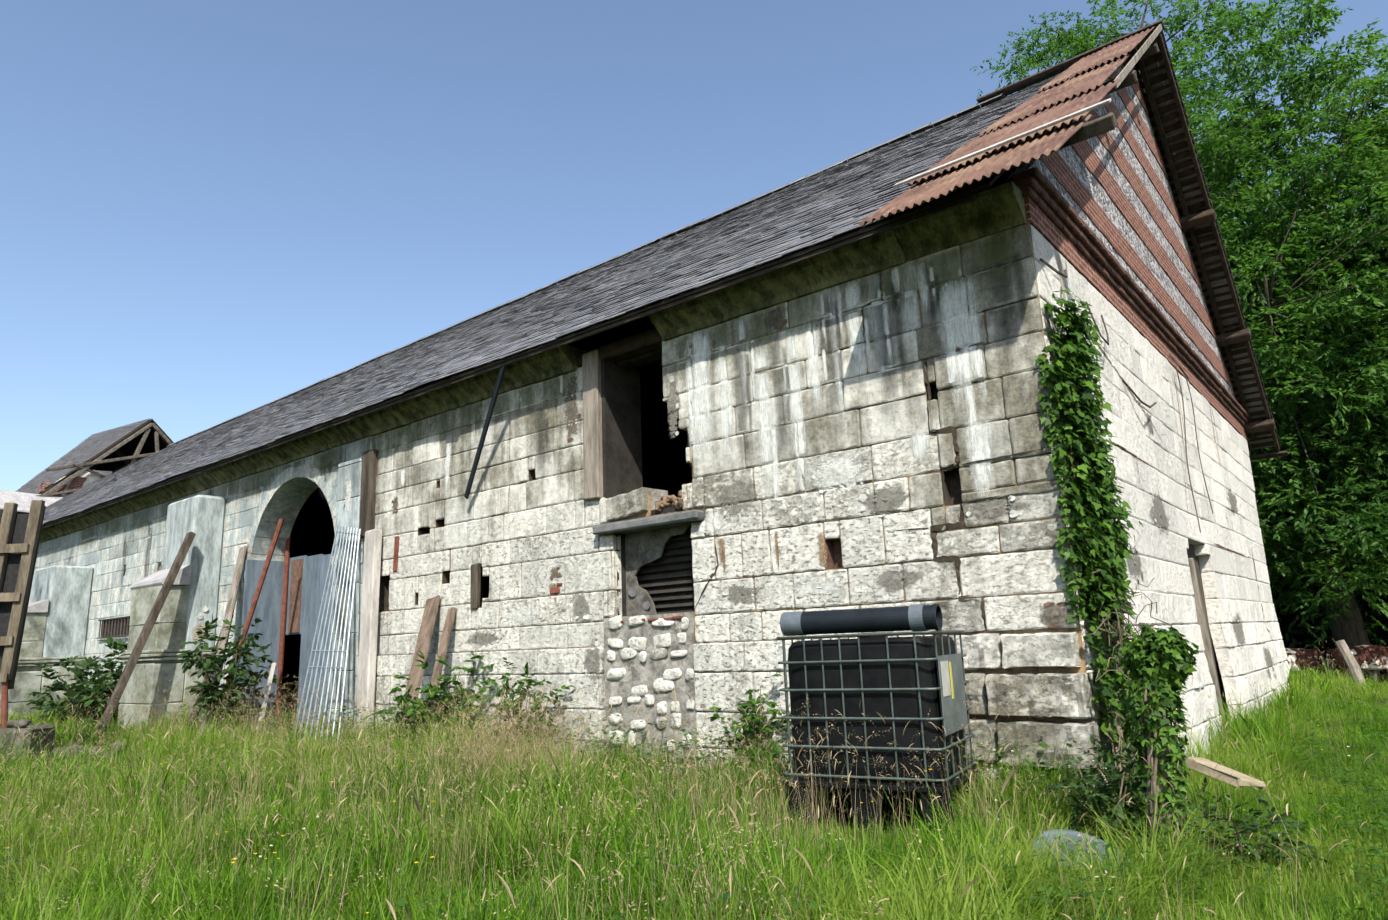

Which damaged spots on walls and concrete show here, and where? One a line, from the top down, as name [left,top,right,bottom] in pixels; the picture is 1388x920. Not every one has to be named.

spalling [667,376,681,438]
water stain [679,251,991,497]
flaking render [625,479,760,616]